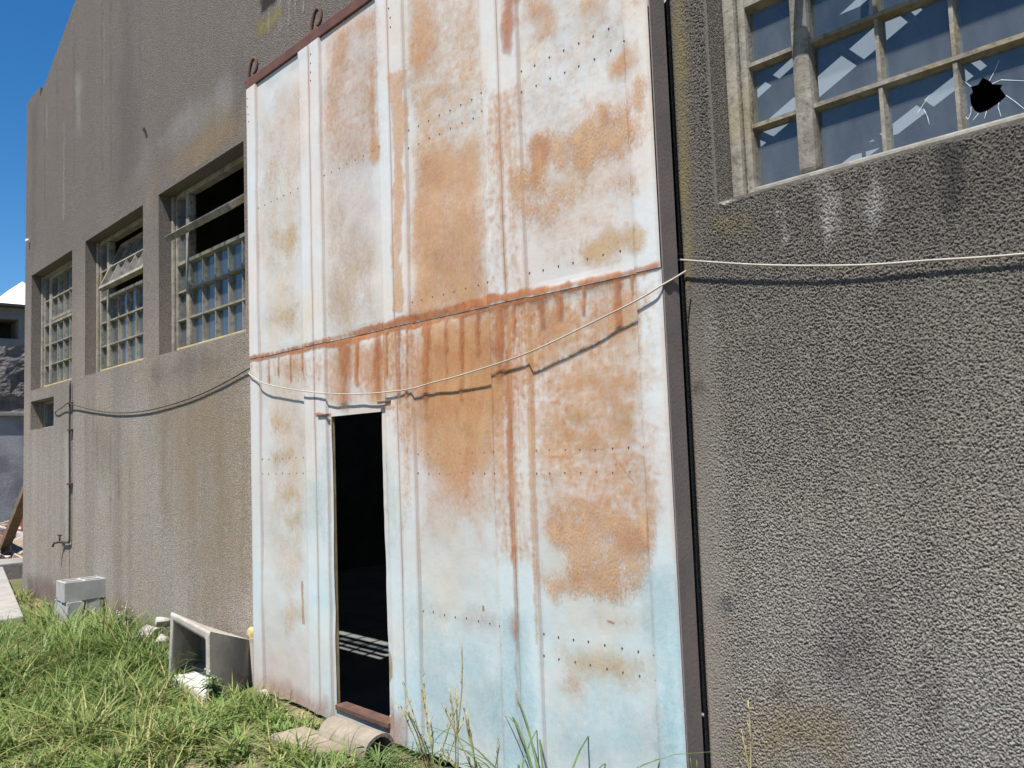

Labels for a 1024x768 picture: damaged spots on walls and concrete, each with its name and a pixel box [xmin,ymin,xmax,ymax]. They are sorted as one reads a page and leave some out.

rust [249,75,658,559]
rust [534,498,654,601]